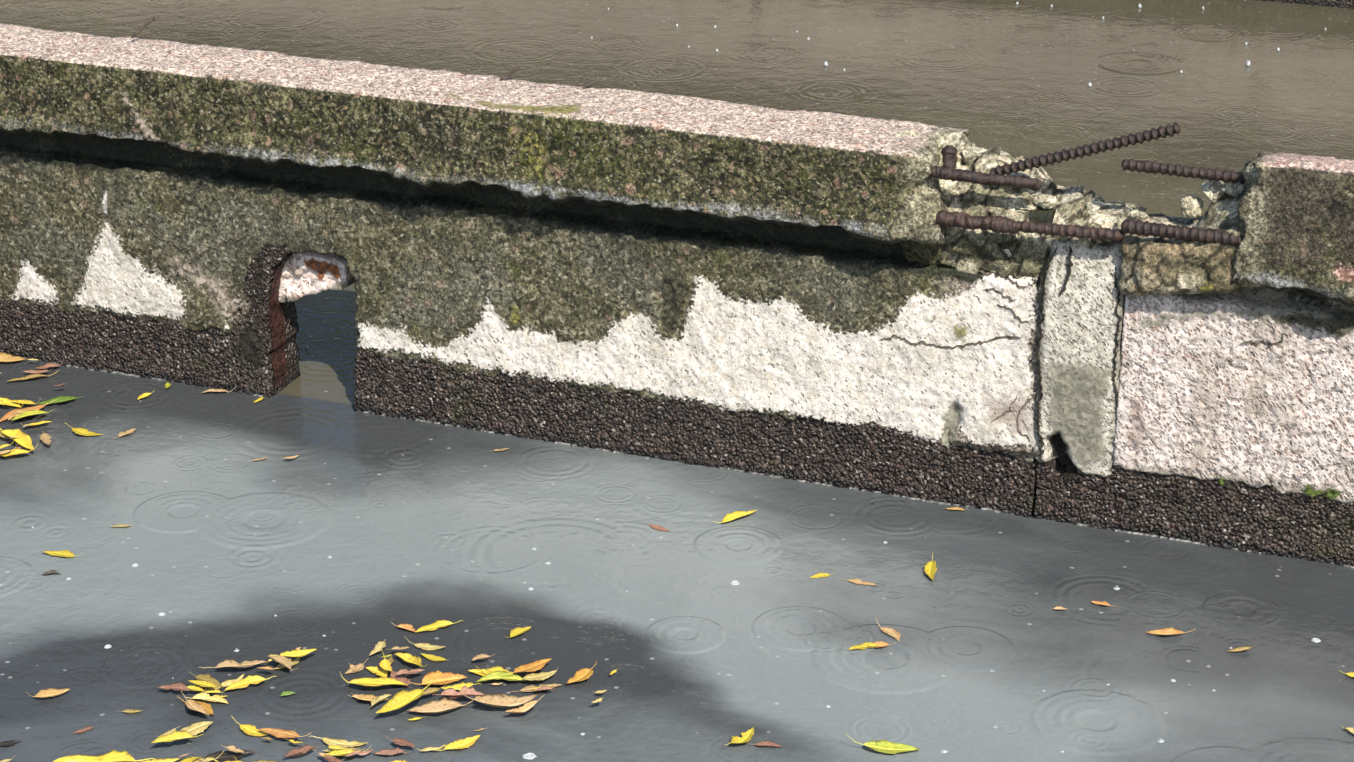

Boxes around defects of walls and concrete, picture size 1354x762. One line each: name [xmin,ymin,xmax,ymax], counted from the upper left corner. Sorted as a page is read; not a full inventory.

peeling [9,222,187,320]
corrosion [269,260,288,388]
corrosion [305,258,340,281]
peeling [357,273,1077,481]
crack [880,246,1073,463]
crack [1112,272,1122,405]